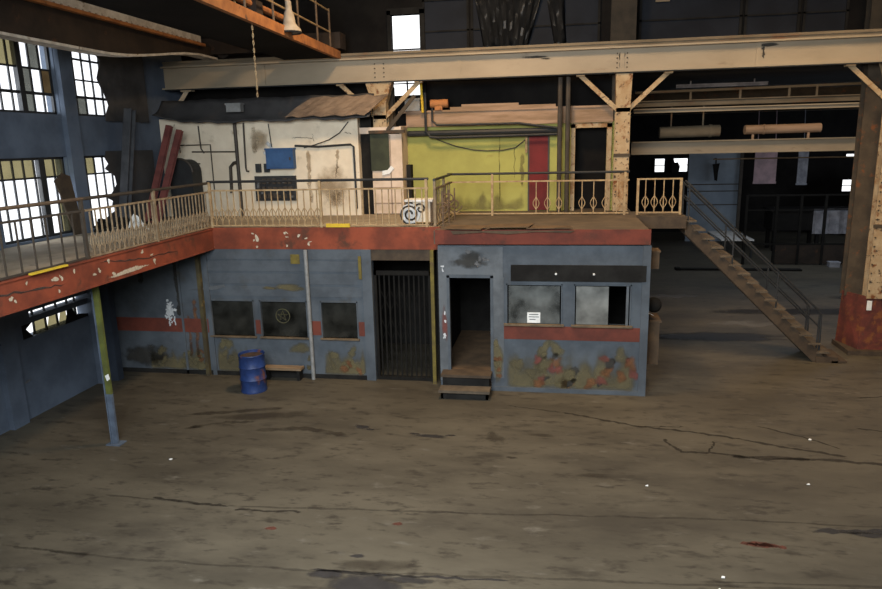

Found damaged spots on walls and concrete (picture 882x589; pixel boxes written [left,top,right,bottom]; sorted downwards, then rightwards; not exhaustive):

spalling [93,250,156,278]
crack [515,406,882,466]